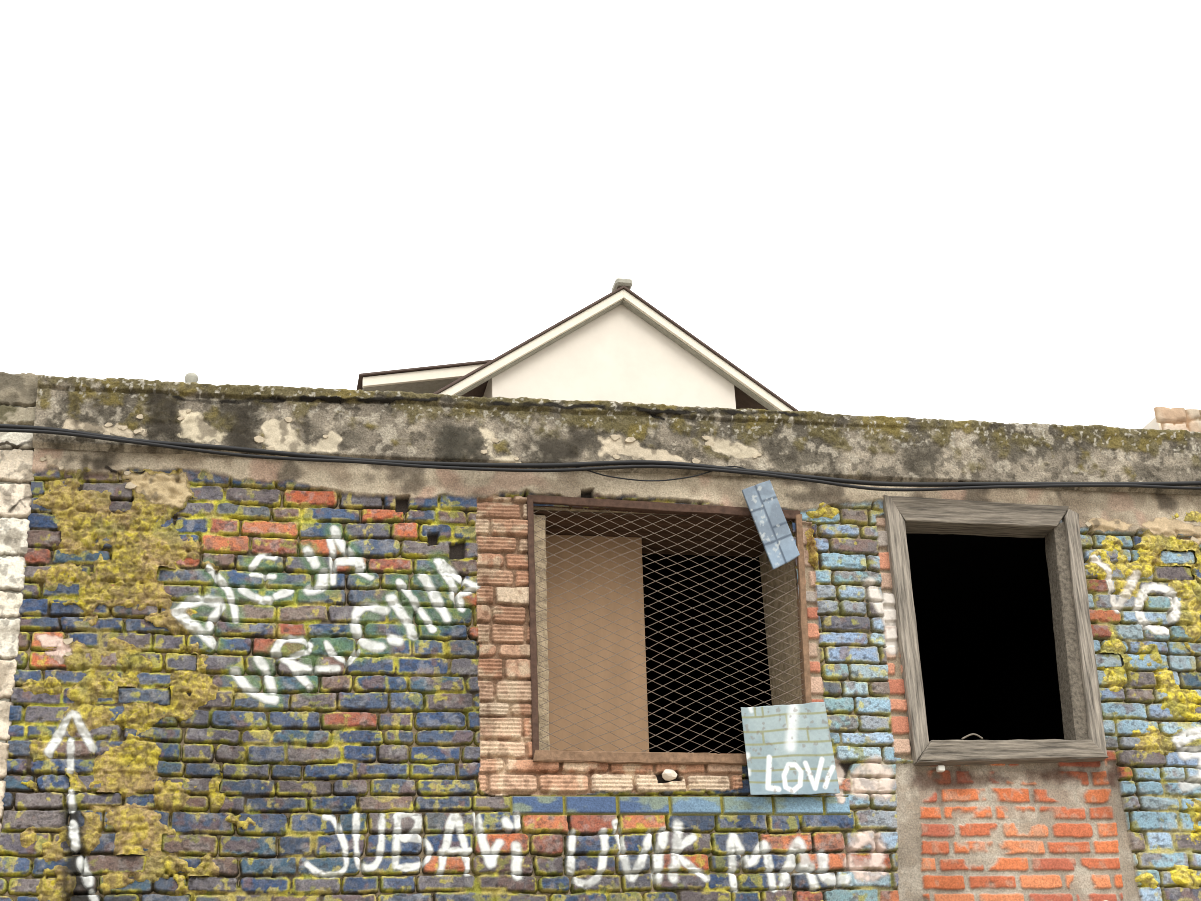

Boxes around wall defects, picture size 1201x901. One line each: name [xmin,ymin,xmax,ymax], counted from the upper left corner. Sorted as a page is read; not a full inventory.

peeling [177,409,227,445]
damp [436,425,486,462]
damp [535,432,593,463]
peeling [598,435,701,464]
peeling [701,436,762,459]